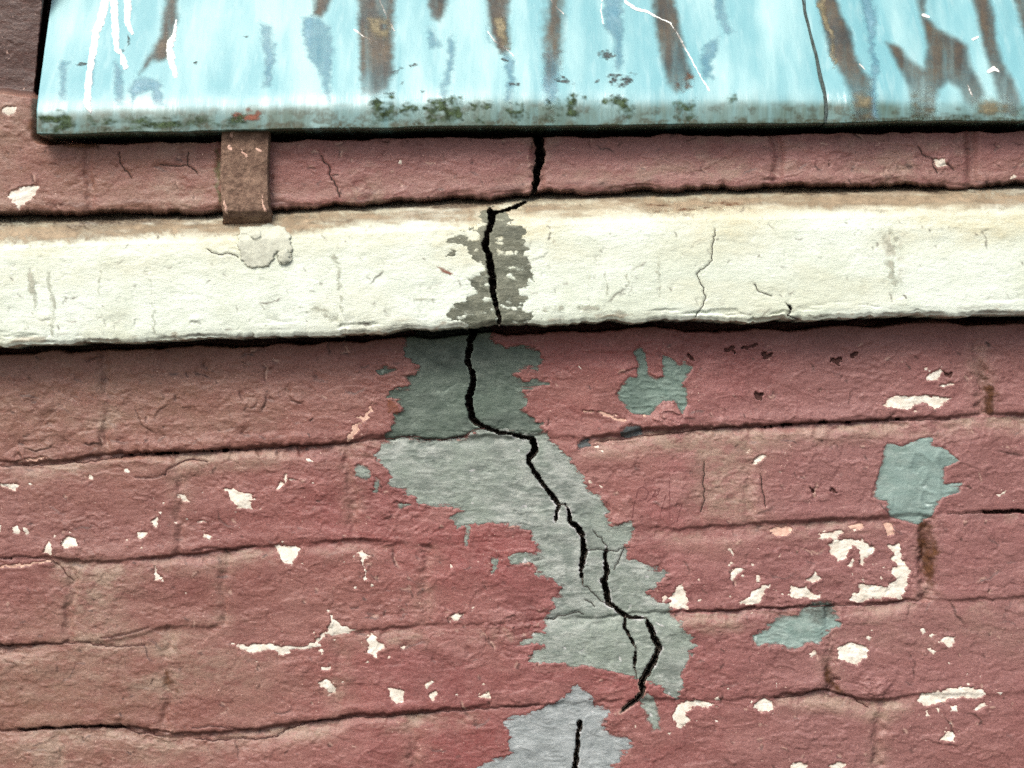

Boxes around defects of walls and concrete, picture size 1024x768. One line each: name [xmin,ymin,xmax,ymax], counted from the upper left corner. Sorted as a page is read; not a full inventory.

rust [817,0,837,63]
rust [233,109,260,120]
peeling [882,366,953,412]
crack [0,136,661,713]
peeling [354,206,729,768]
peeling [769,526,793,536]
peeling [818,437,962,602]
peeling [753,572,841,657]
peeling [231,610,390,696]
peeling [833,630,873,666]
peeling [750,698,775,712]
crack [572,720,582,768]